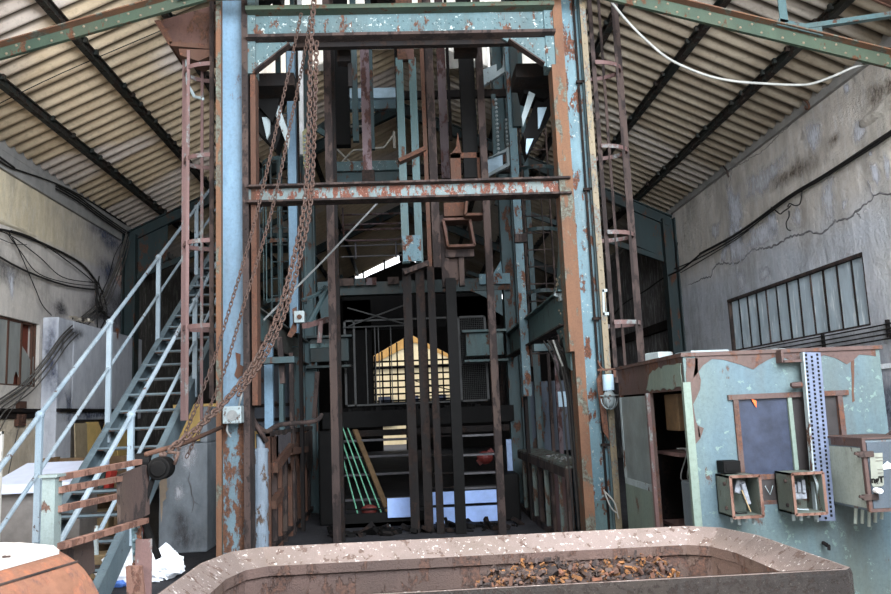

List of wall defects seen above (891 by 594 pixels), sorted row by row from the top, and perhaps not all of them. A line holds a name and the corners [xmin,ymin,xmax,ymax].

crack [691,182,891,285]